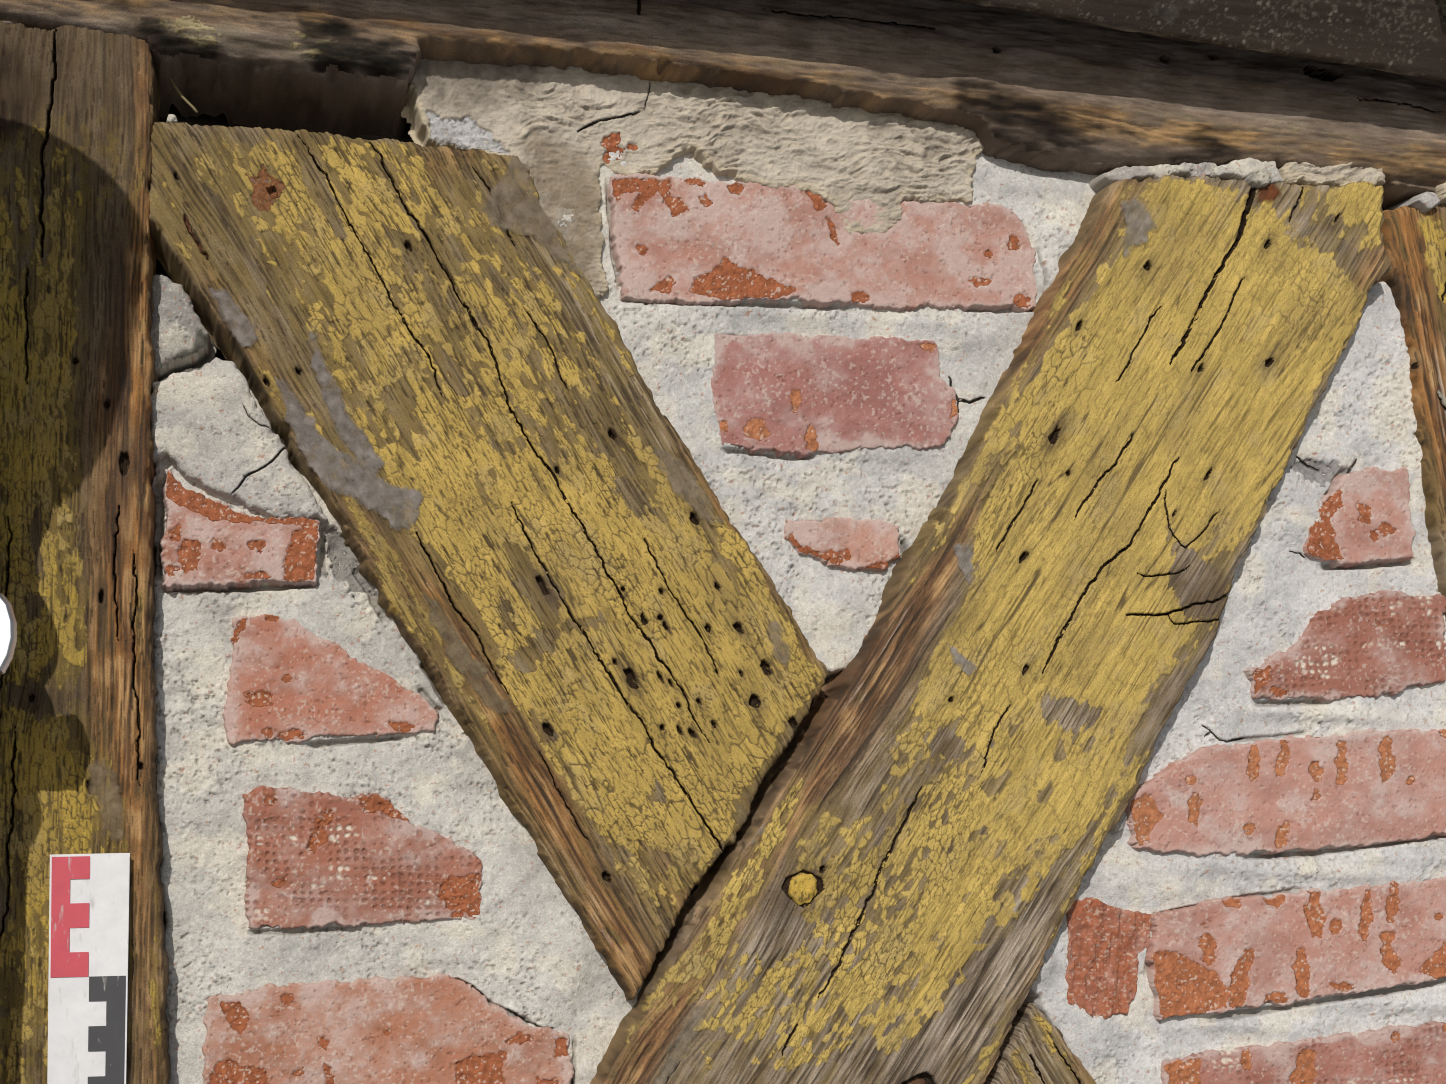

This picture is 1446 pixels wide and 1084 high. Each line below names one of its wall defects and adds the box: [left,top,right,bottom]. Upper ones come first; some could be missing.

spalling [601,132,713,217]
crack [298,136,443,397]
crack [1116,187,1256,381]
spalling [165,471,376,600]
crack [369,142,719,743]
crack [1074,433,1134,520]
crack [1042,457,1228,674]
spalling [1290,459,1396,561]
crack [511,502,723,852]
peeling [658,962,1012,1084]
spalling [1151,920,1255,1019]
spalling [1263,881,1403,1003]